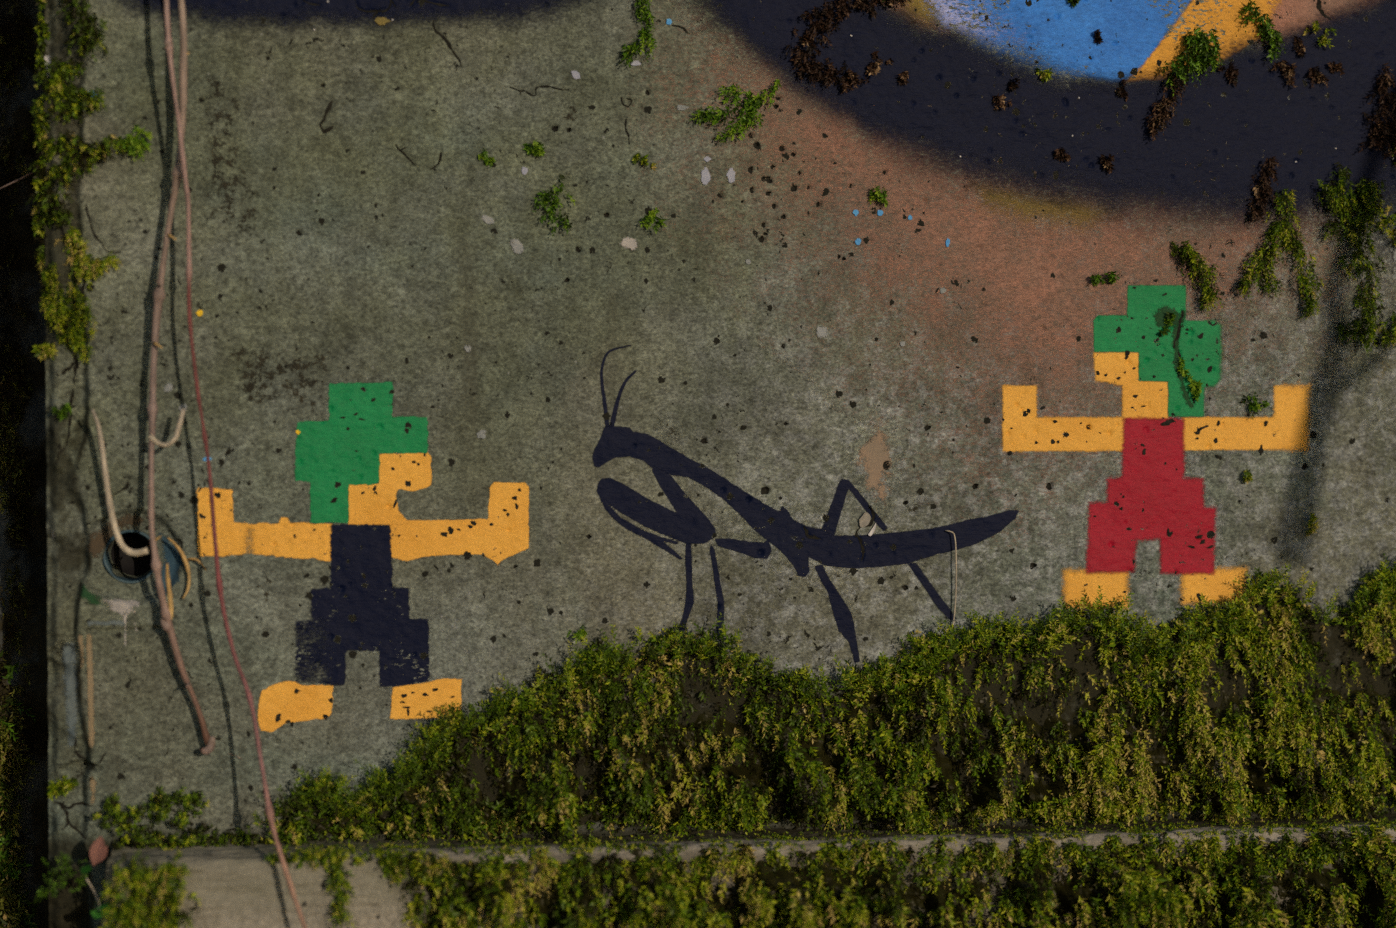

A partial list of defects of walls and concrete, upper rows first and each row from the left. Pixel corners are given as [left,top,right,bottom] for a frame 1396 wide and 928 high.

crack [1317,0,1332,20]